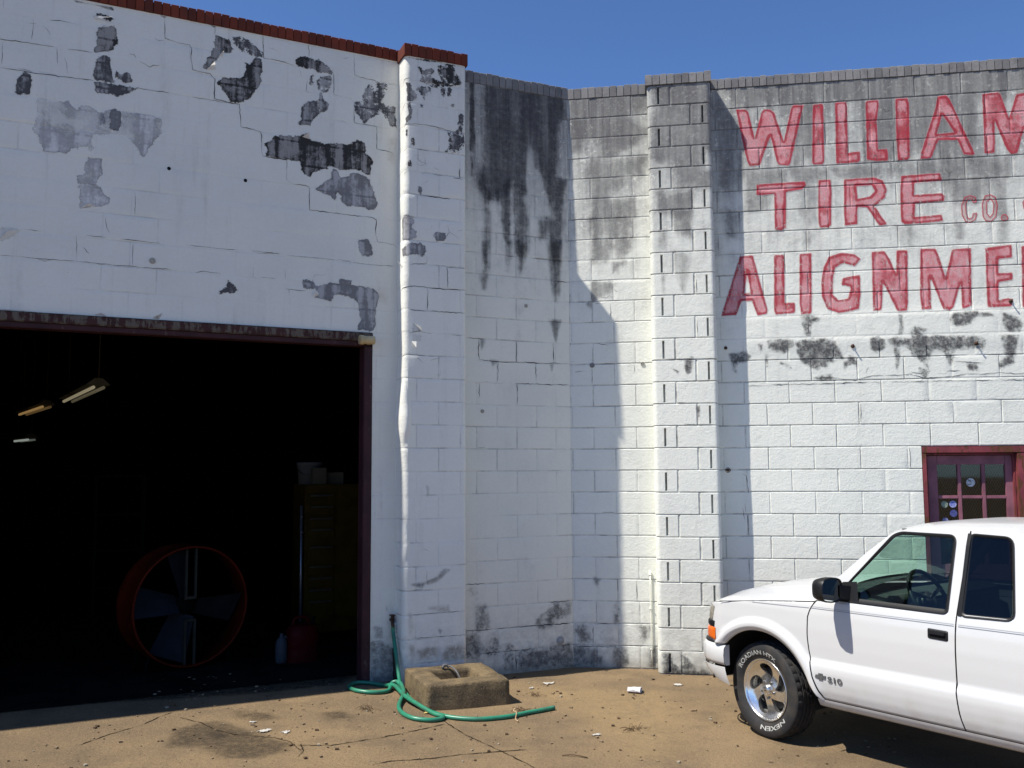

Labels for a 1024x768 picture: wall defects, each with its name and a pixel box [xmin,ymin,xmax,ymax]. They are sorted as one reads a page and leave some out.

peeling [32,13,160,209]
peeling [203,35,263,103]
peeling [264,56,378,210]
peeling [354,57,465,153]
water stain [470,83,642,293]
peeling [302,279,379,331]